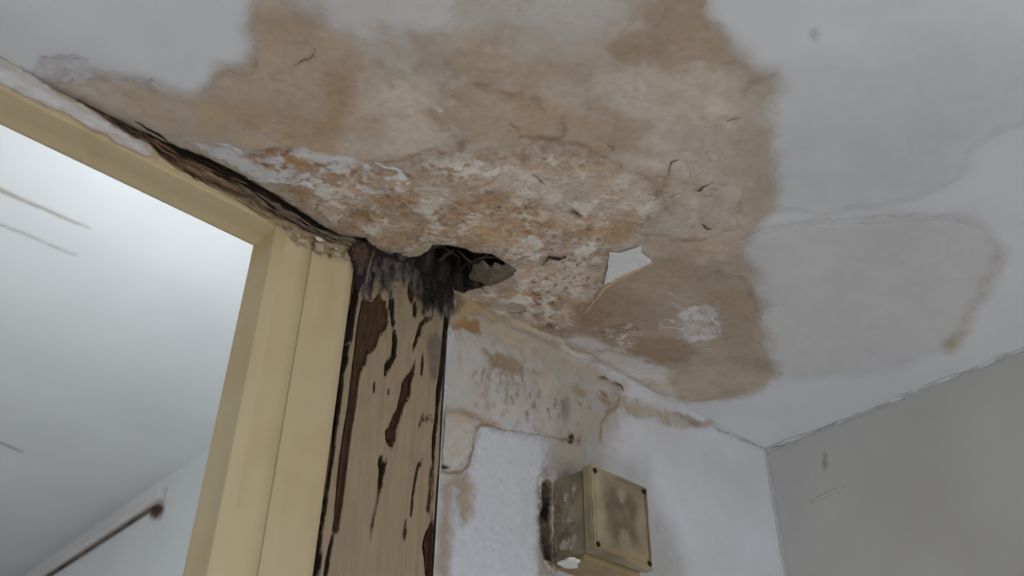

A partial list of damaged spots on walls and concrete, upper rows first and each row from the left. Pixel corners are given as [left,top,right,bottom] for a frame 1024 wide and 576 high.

leakage [42,0,778,469]
flaking render [195,143,667,350]